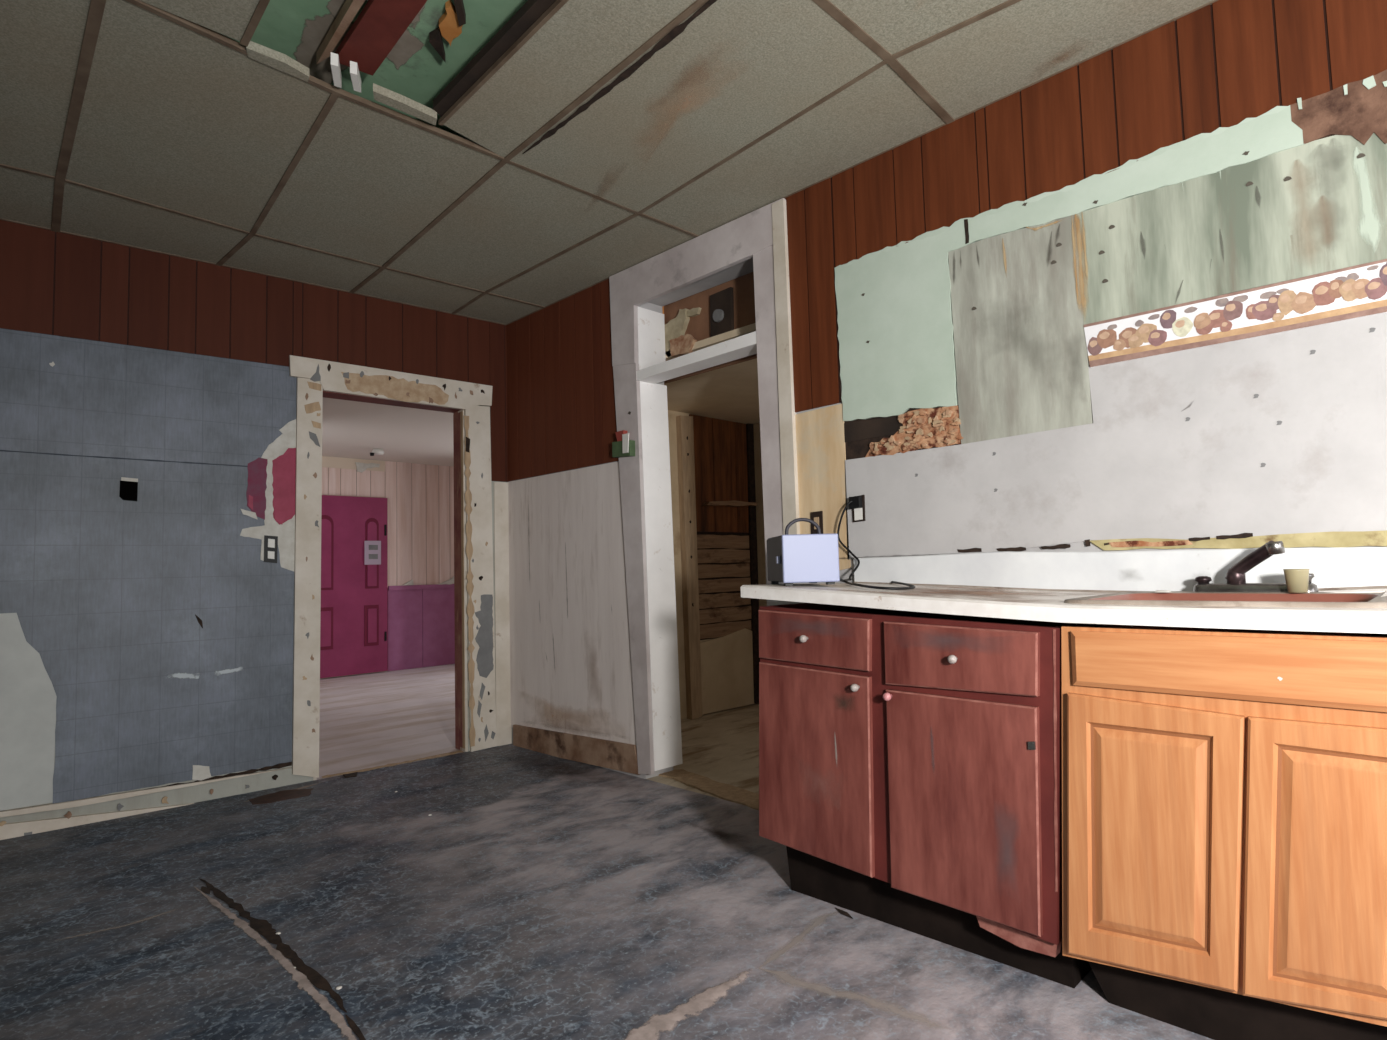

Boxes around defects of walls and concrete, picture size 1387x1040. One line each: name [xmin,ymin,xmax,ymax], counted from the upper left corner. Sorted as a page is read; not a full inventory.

spalling [246,0,437,126]
flaking render [387,0,466,70]
flaking render [1290,69,1387,145]
spalling [844,405,963,460]
spalling [119,477,138,501]
peeling [192,765,214,795]
crack [194,878,366,1040]